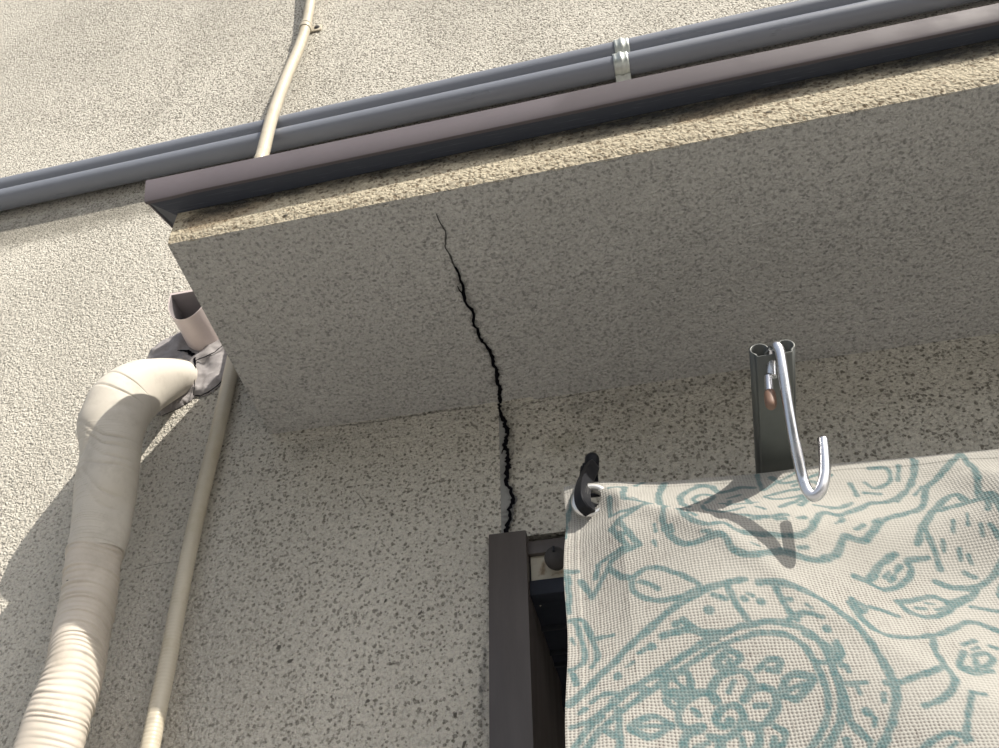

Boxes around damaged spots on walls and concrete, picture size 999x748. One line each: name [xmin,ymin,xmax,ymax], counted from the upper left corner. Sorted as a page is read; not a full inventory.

crack [436,214,518,533]